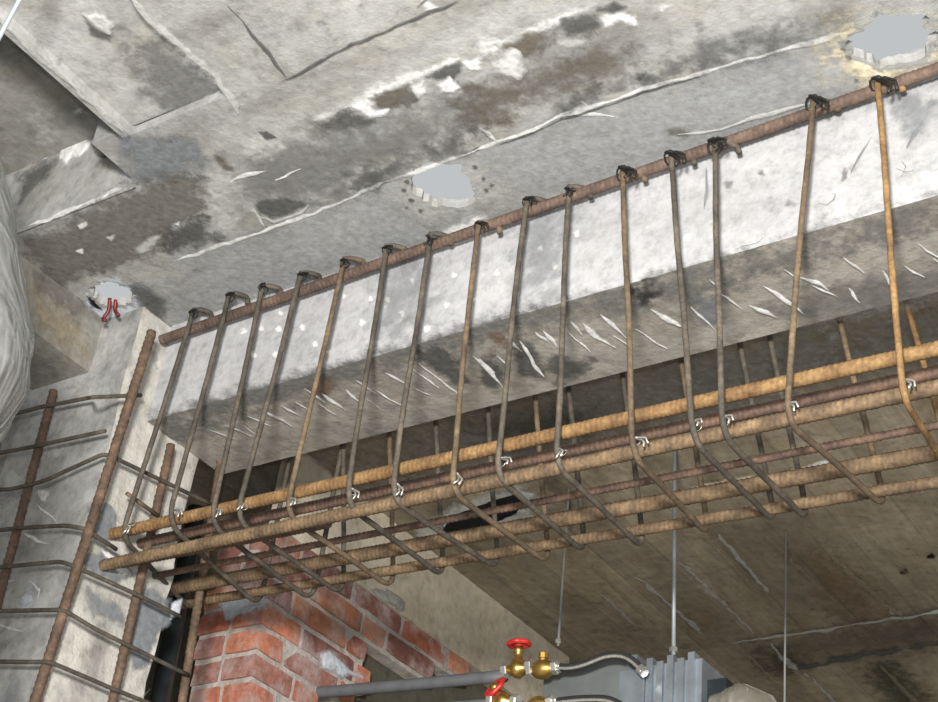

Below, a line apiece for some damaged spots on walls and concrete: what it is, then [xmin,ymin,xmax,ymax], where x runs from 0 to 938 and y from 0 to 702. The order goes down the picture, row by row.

leakage [133,43,221,110]
crack [227,0,458,80]
spalling [824,28,921,88]
leakage [230,48,617,203]
crack [178,32,843,260]
leakage [22,135,225,353]
peeling [85,503,132,582]
spalling [416,486,534,537]
peeling [87,591,124,622]
peeling [130,589,183,668]
crack [732,609,938,644]
crack [789,643,938,670]